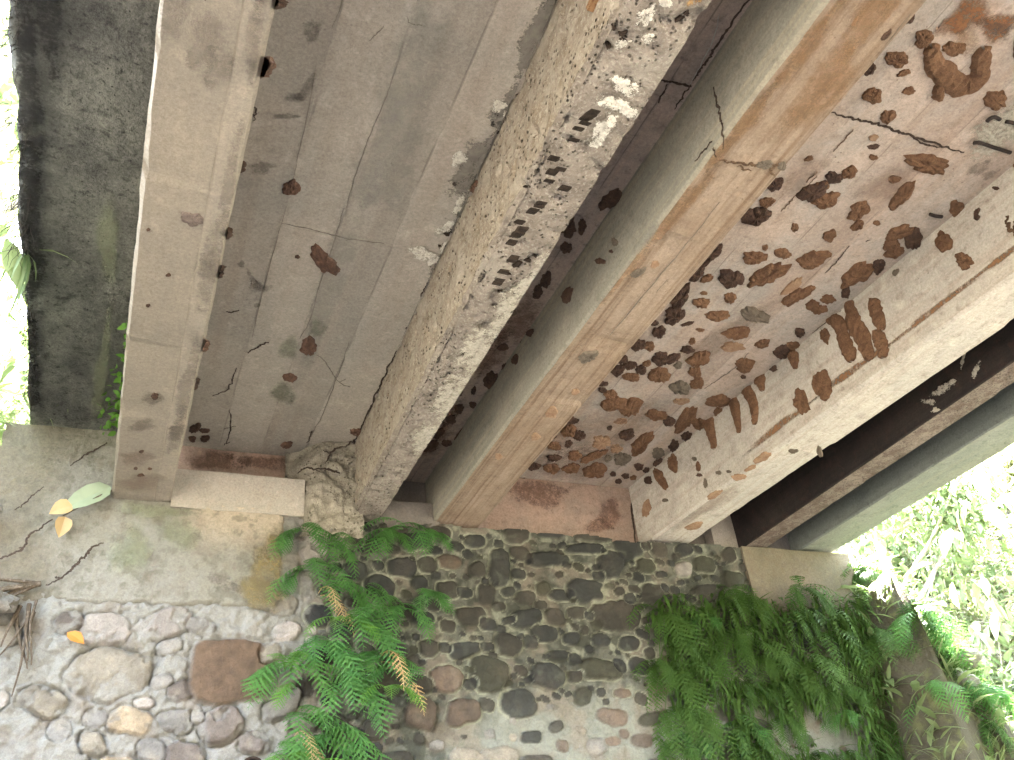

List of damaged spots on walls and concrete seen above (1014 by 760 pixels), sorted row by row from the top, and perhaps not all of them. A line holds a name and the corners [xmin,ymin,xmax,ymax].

water stain [14,0,63,411]
peeling [397,0,557,350]
crack [658,0,787,176]
spalling [862,87,897,125]
spalling [864,28,916,95]
crack [831,112,964,153]
spalling [907,14,1014,161]
rust [936,0,1014,42]
crack [1005,215,1014,236]
crack [298,327,408,474]
spalling [528,201,974,517]
crack [46,543,103,586]